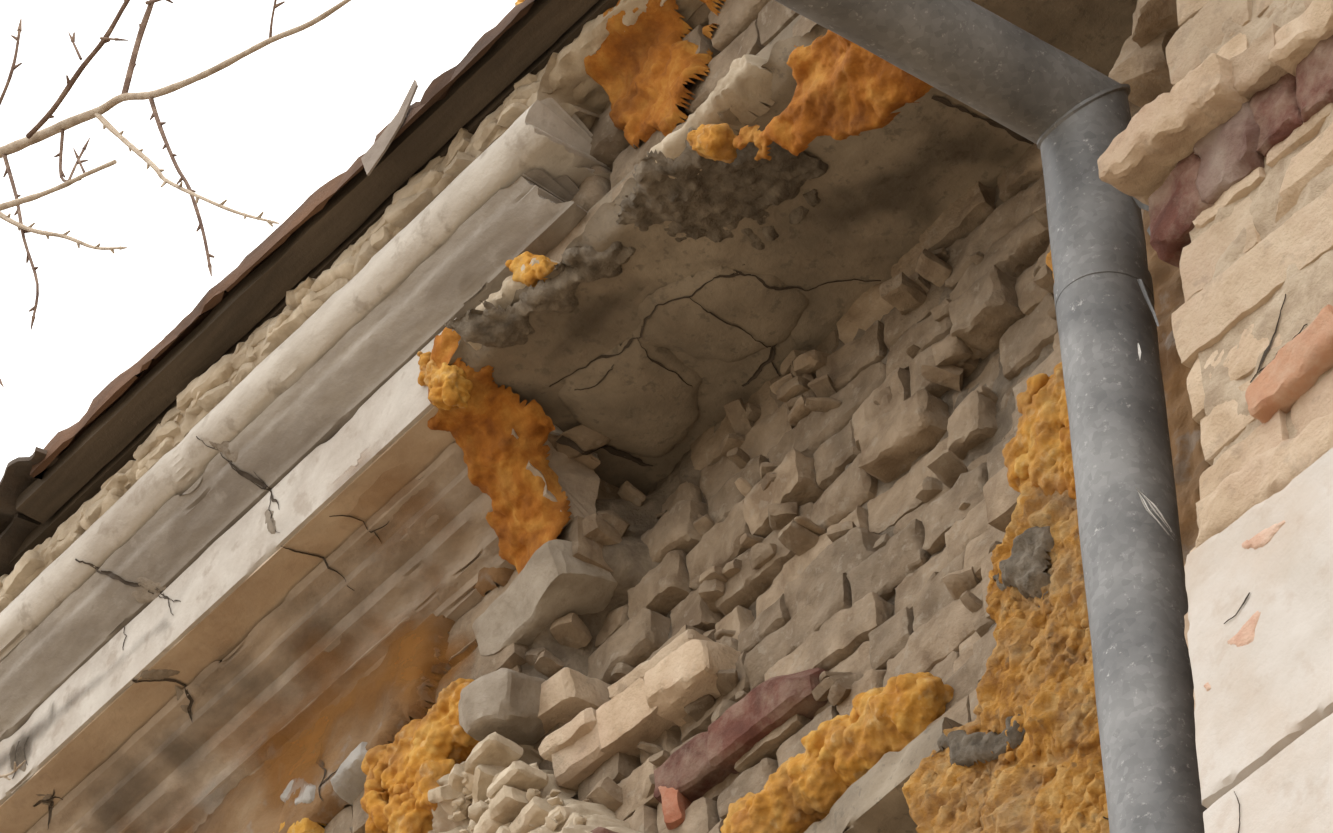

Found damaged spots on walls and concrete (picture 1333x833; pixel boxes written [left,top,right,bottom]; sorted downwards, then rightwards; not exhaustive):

spalling [615,128,828,250]
spalling [444,241,636,348]
crack [549,271,881,390]
crack [1250,294,1307,383]
crack [196,436,353,590]
crack [329,515,389,544]
crack [75,559,194,721]
crack [9,737,63,828]